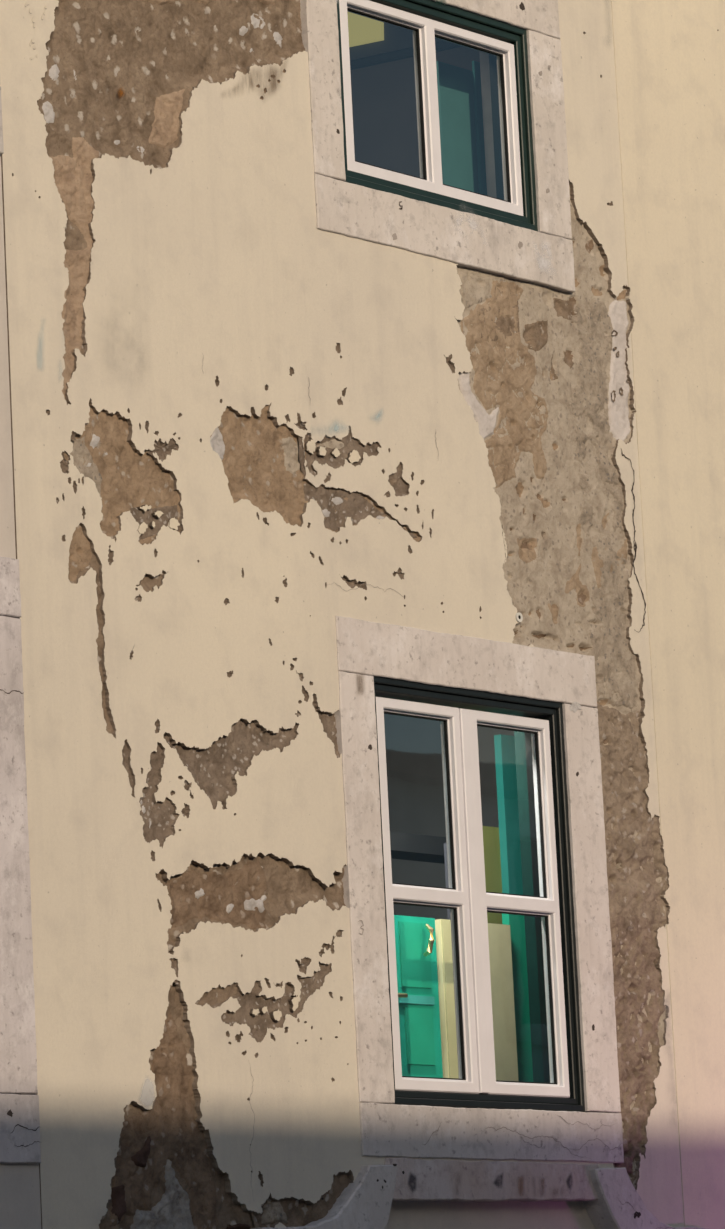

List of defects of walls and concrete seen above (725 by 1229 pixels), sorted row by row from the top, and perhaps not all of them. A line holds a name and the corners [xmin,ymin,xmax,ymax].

spalling [25,0,305,404]
spalling [56,407,350,1229]
spalling [200,377,433,553]
spalling [446,186,668,1188]
crack [621,449,646,632]